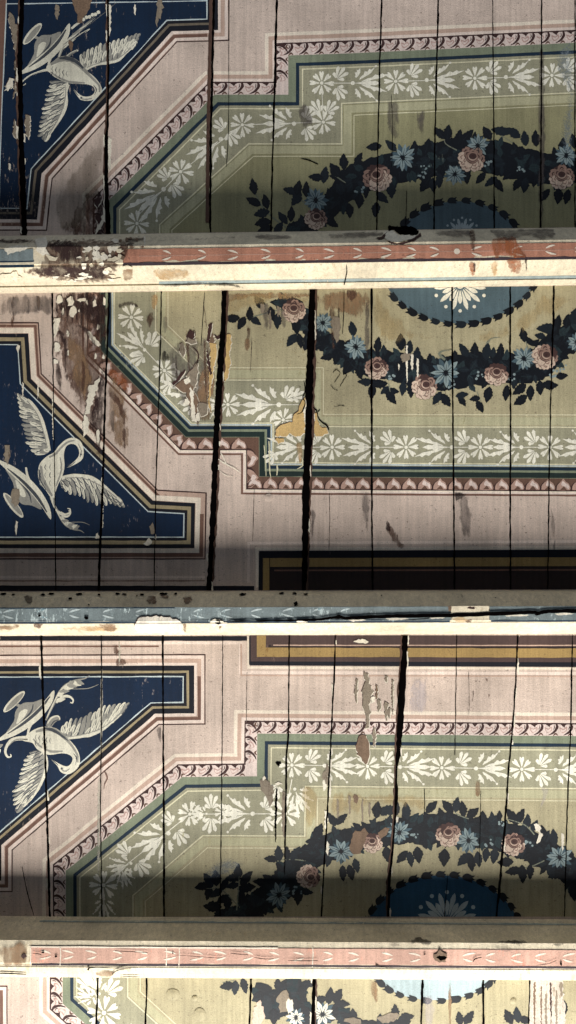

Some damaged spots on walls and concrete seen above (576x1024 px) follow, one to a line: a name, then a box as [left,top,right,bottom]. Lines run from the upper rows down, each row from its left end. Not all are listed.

crack [15,0,28,235]
crack [103,0,111,234]
peeling [4,236,58,261]
peeling [53,197,146,284]
peeling [377,225,421,245]
peeling [53,294,106,364]
peeling [82,377,100,443]
peeling [172,323,233,422]
crack [189,291,229,591]
spalling [275,397,329,444]
crack [219,286,576,917]
peeling [354,671,394,765]